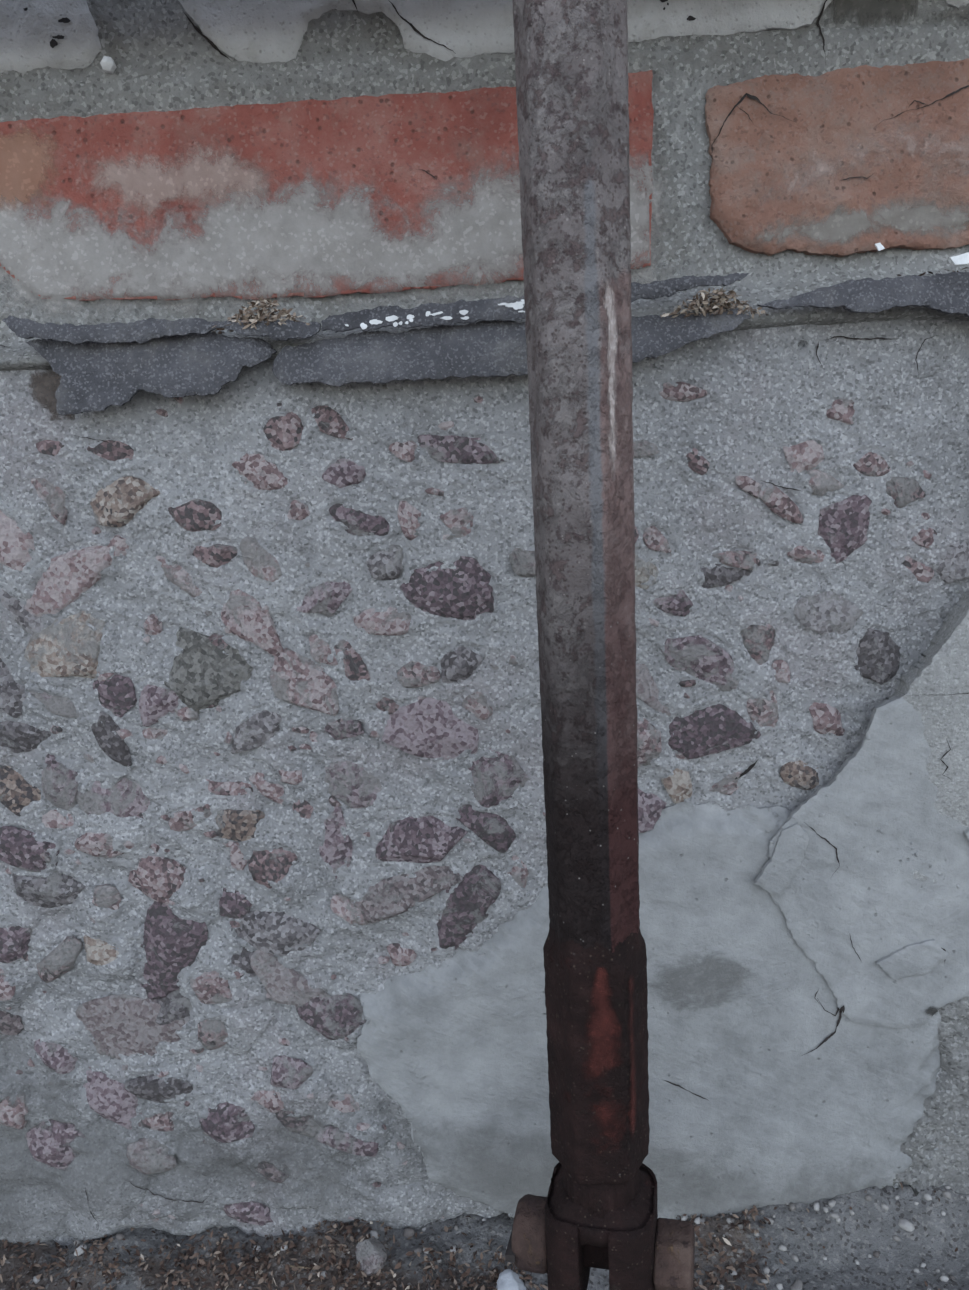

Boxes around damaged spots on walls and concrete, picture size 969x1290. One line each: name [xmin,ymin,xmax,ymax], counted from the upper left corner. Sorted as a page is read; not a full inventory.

crack [816,0,827,58]
crack [876,85,969,126]
spalling [632,319,969,1220]
spalling [0,362,559,1246]
crack [804,822,840,873]
crack [804,991,845,1055]